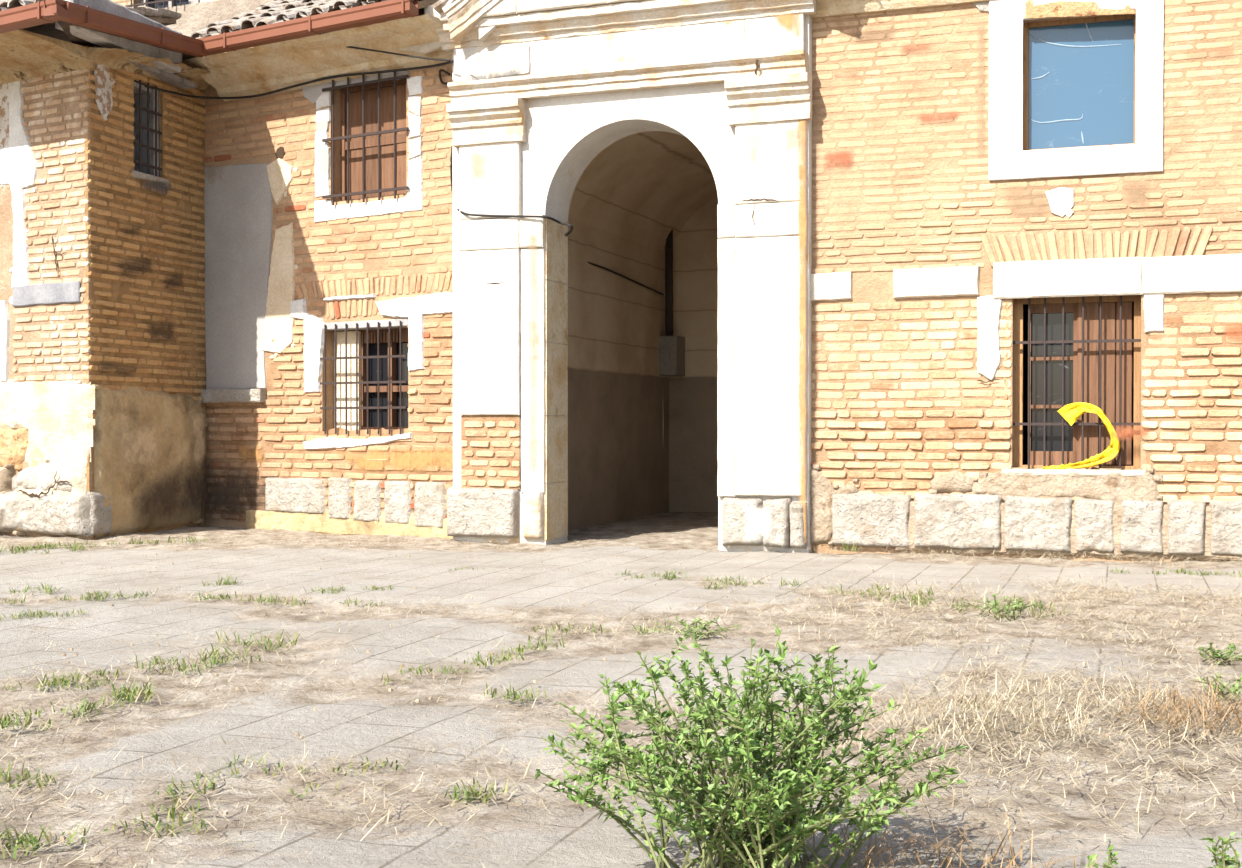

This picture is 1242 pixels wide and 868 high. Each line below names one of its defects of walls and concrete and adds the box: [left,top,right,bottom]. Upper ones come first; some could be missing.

flaking render [0,81,37,305]
water stain [121,425,158,466]
water stain [143,413,266,515]